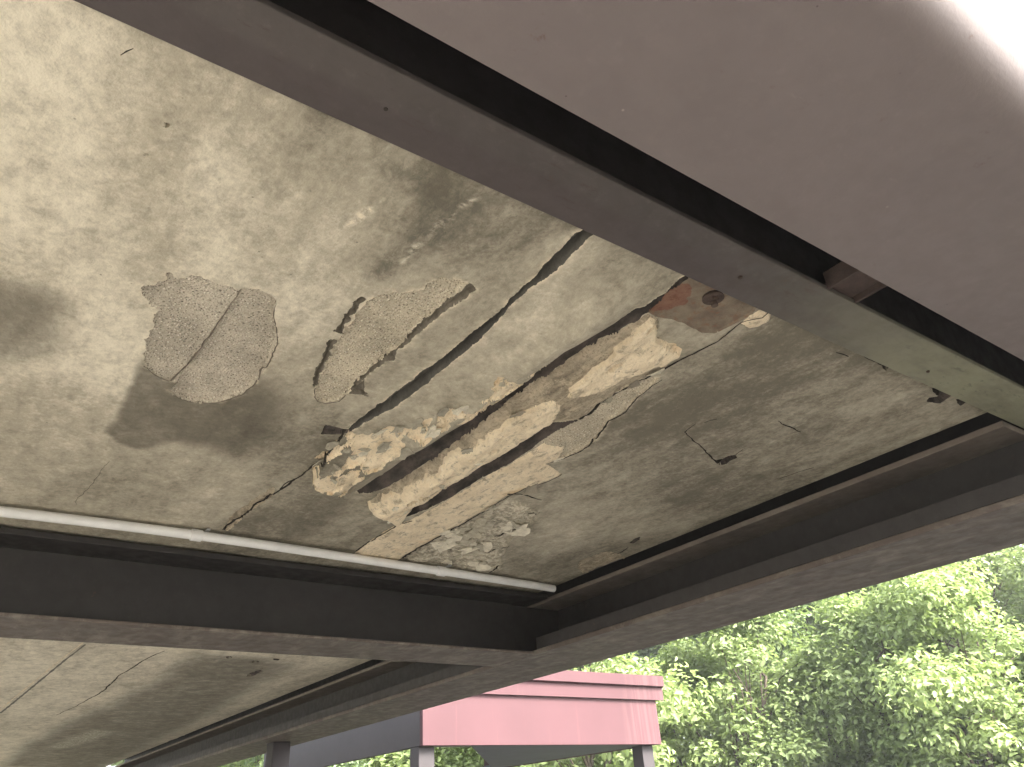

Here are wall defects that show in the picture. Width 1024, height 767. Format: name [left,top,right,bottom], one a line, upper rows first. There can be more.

water stain [0,267,96,380]
peeling [141,272,279,404]
peeling [313,277,476,404]
water stain [100,347,323,466]
crack [222,429,347,530]
peeling [321,425,352,435]
flaking render [355,378,658,574]
crack [402,313,768,559]
crack [0,643,86,713]
crack [57,651,164,715]